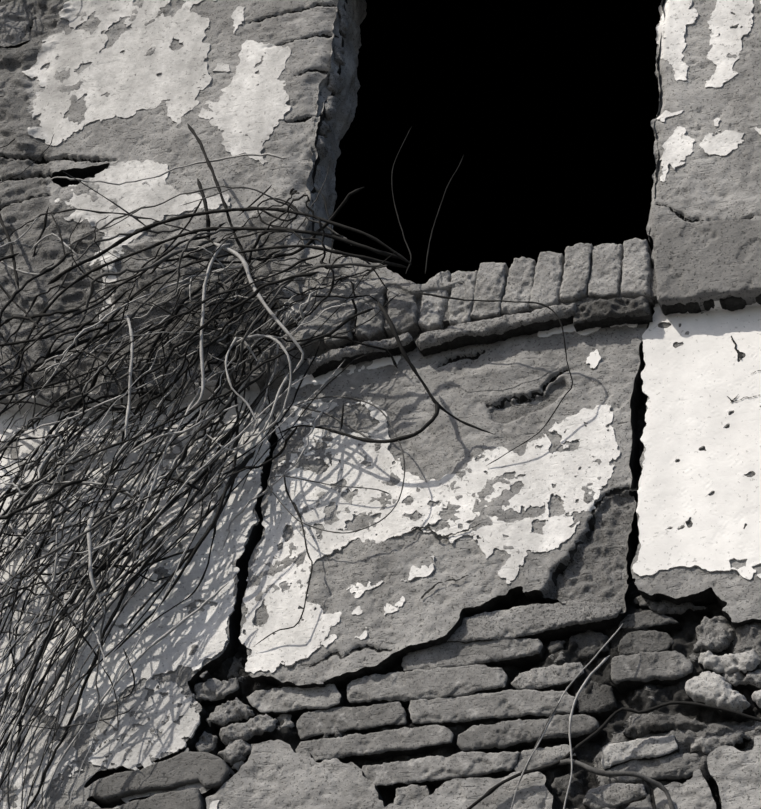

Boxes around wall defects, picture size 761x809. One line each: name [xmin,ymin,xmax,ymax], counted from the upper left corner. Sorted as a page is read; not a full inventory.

peeling [22,0,292,165]
peeling [656,110,684,123]
peeling [656,0,699,81]
peeling [660,118,745,182]
peeling [705,0,761,88]
crack [552,394,648,599]
spalling [0,301,761,809]
crack [238,629,247,655]
crack [712,790,722,809]